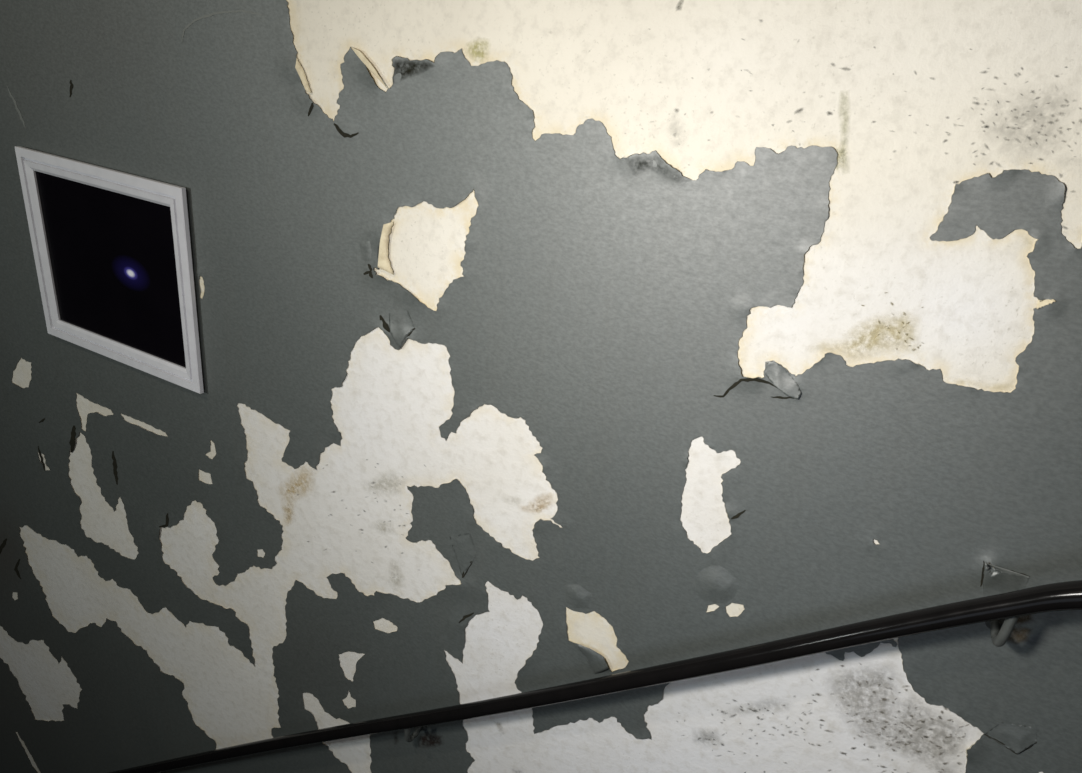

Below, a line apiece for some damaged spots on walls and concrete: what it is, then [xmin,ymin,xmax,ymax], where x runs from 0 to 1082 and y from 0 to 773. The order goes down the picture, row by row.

peeling [286,0,1082,400]
peeling [11,358,32,388]
peeling [19,310,562,750]
peeling [680,436,741,553]
peeling [15,732,41,773]
peeling [0,626,82,722]
peeling [321,735,372,773]
peeling [566,607,629,673]
peeling [462,638,984,773]
peeling [706,603,745,617]